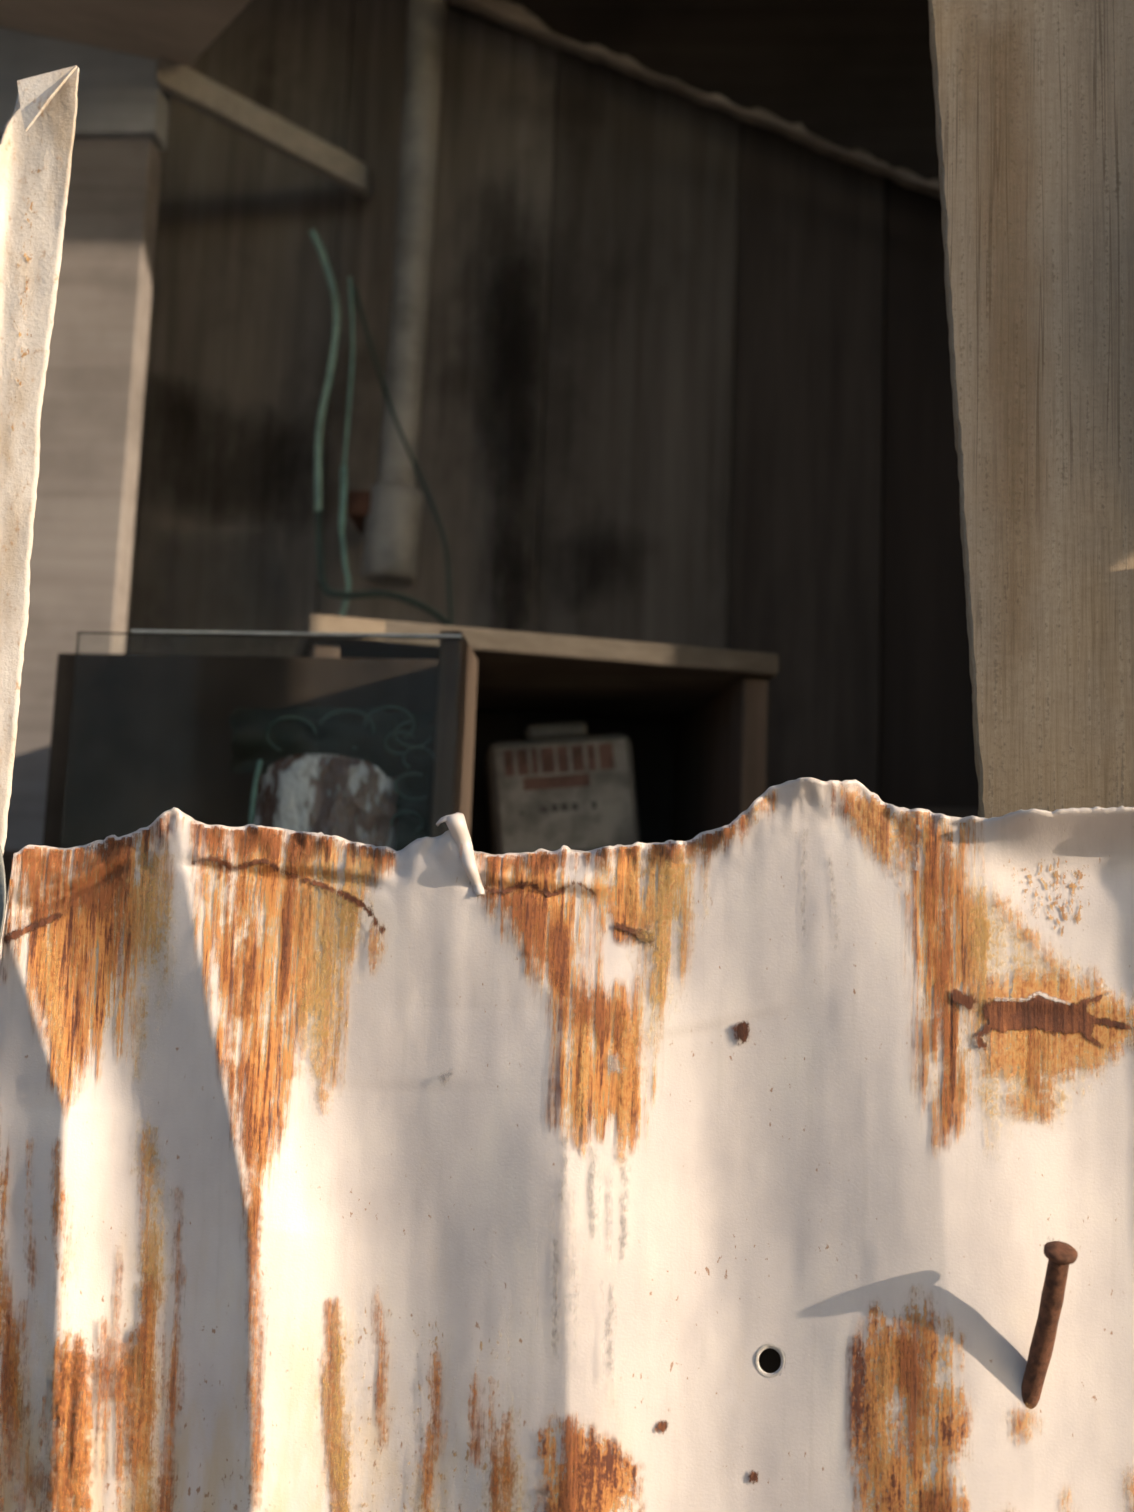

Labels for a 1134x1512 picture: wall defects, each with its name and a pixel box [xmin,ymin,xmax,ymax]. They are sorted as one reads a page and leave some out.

rust [474,791,776,1162]
rust [832,789,1134,1147]
peeling [951,988,1132,1051]
rust [0,813,395,1512]
rust [392,1322,513,1512]
rust [534,1416,643,1512]
rust [849,1293,970,1512]